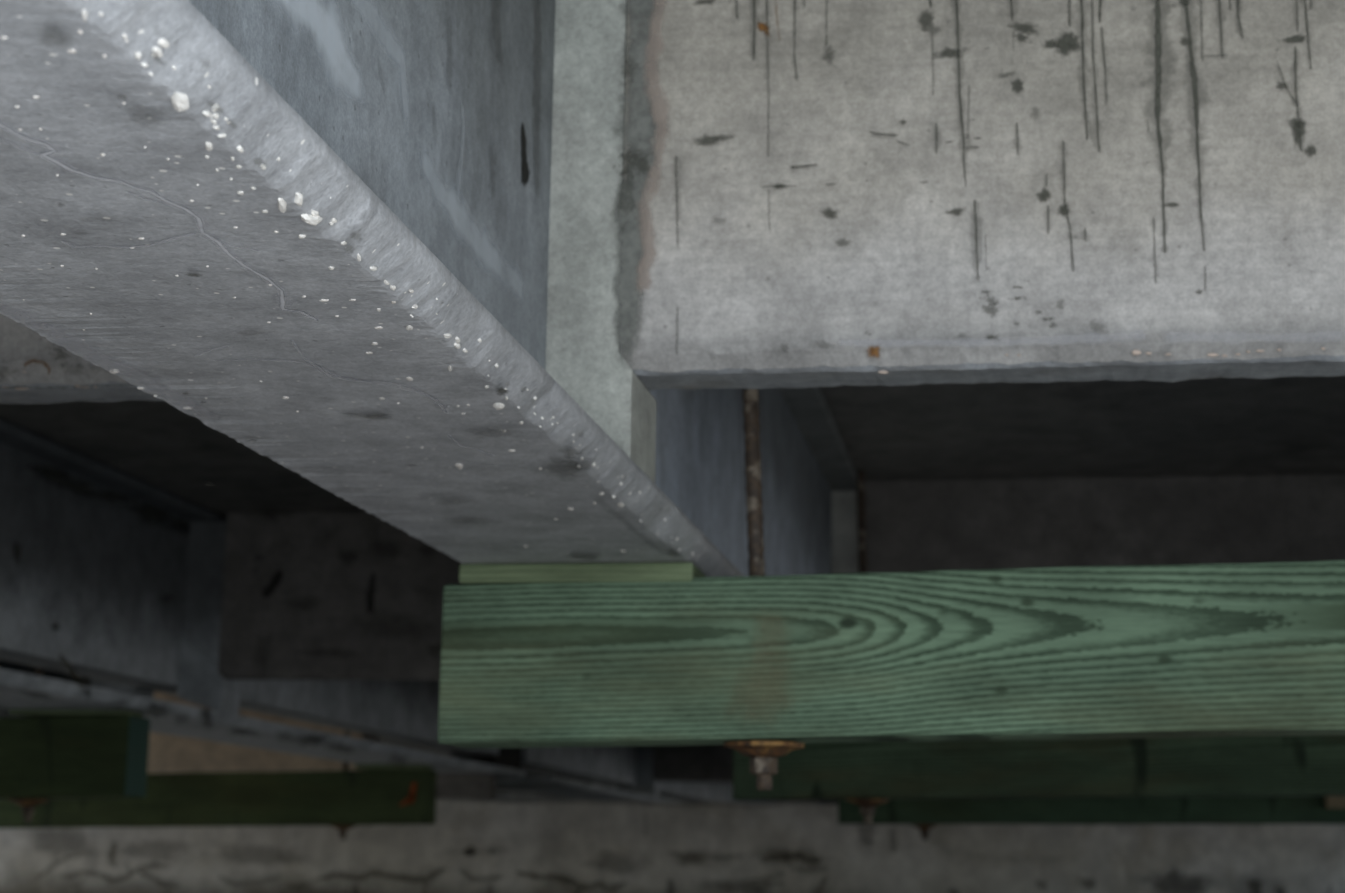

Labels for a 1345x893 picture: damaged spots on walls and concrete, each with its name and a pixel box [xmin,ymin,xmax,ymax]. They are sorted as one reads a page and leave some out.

crack [0,124,317,320]
leakage [614,0,665,356]
leakage [736,0,769,135]
leakage [919,0,932,28]
leakage [941,0,966,186]
leakage [947,200,989,293]
leakage [1010,0,1107,152]
leakage [1038,142,1086,267]
leakage [1153,0,1177,282]
leakage [1181,0,1205,251]
leakage [1219,0,1243,58]
leakage [1277,0,1316,156]